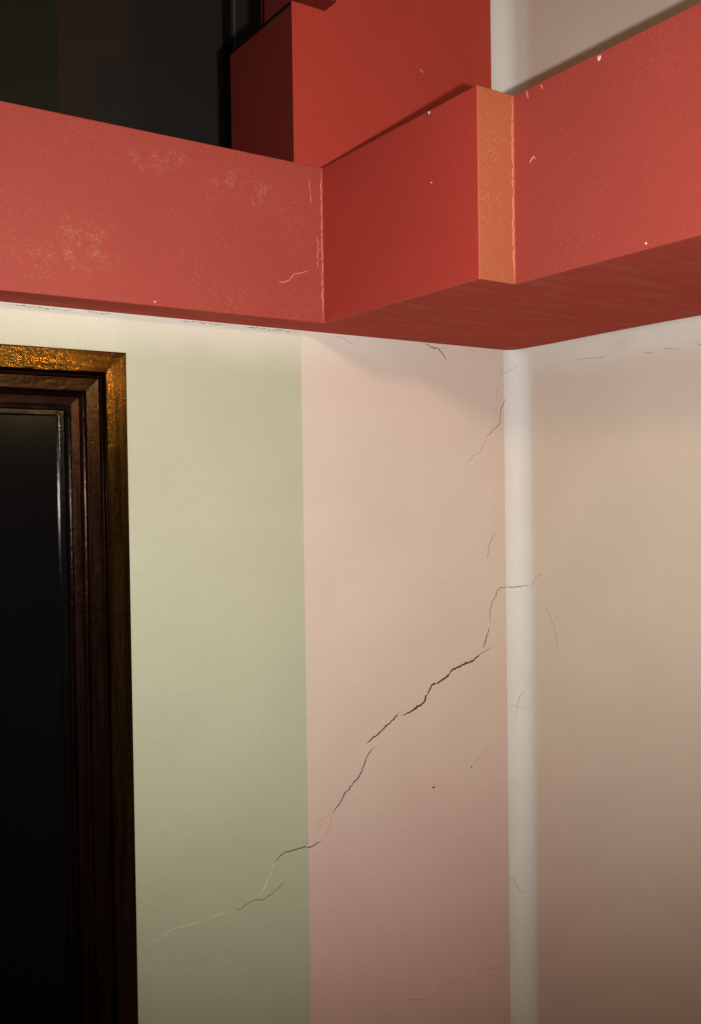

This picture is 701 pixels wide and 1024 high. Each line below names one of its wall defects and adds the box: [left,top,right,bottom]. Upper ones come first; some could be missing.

crack [141,574,541,949]